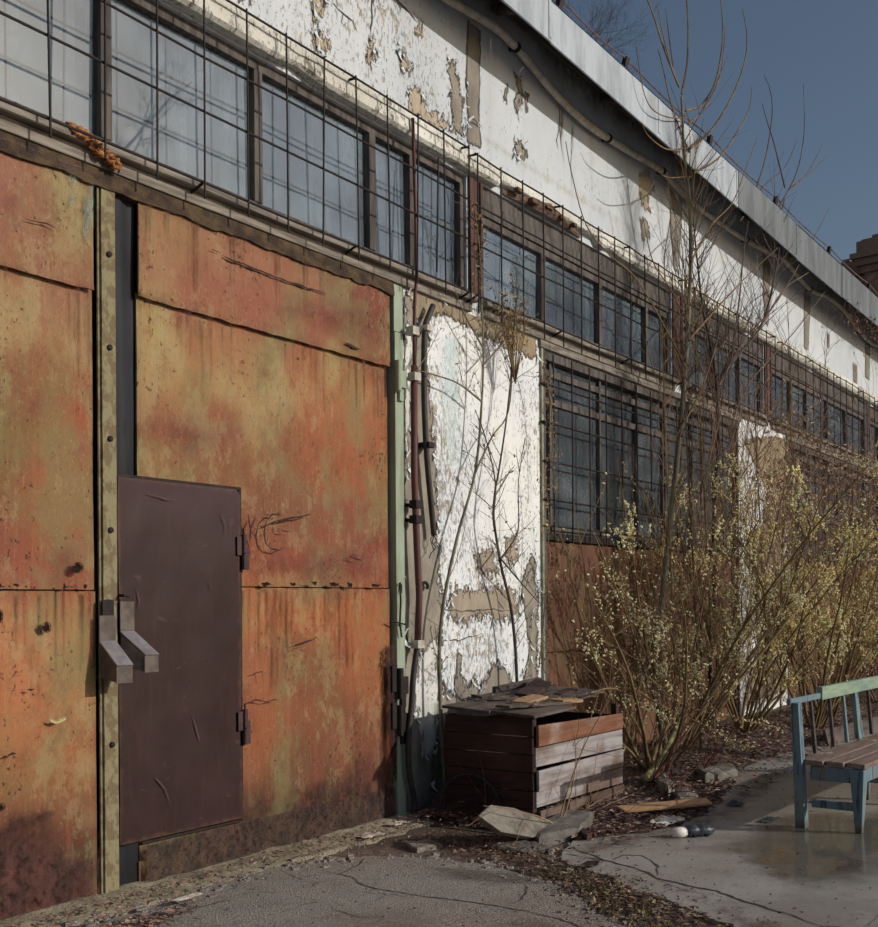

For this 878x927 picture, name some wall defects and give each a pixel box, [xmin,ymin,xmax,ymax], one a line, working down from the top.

peeling [311,0,332,58]
peeling [365,34,381,67]
peeling [397,40,480,140]
peeling [502,67,530,118]
peeling [514,134,529,162]
peeling [638,167,659,247]
peeling [402,288,543,812]
corrosion [386,643,397,779]
crack [282,858,580,927]
crack [570,847,838,927]